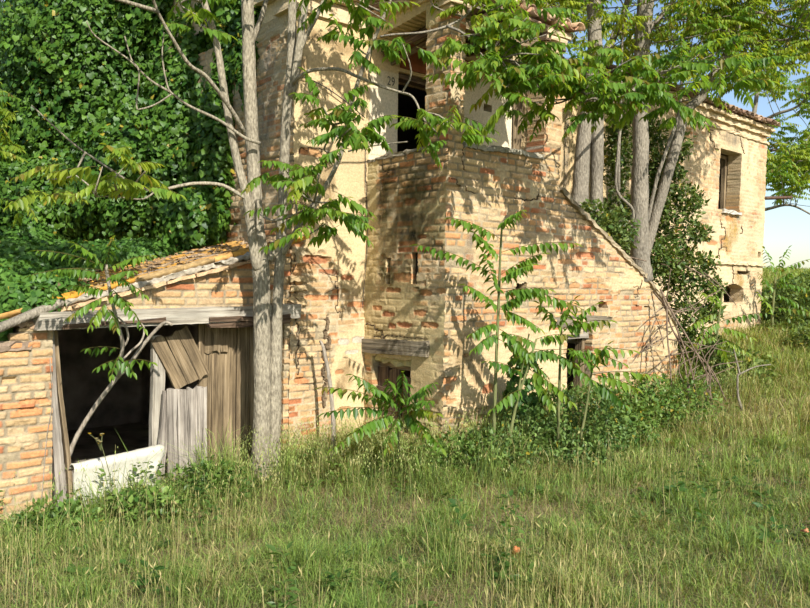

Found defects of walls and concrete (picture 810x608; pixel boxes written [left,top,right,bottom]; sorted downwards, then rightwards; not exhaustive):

spalling [291,254,329,276]
crack [718,220,743,285]
crack [290,253,341,408]
crack [366,322,424,339]